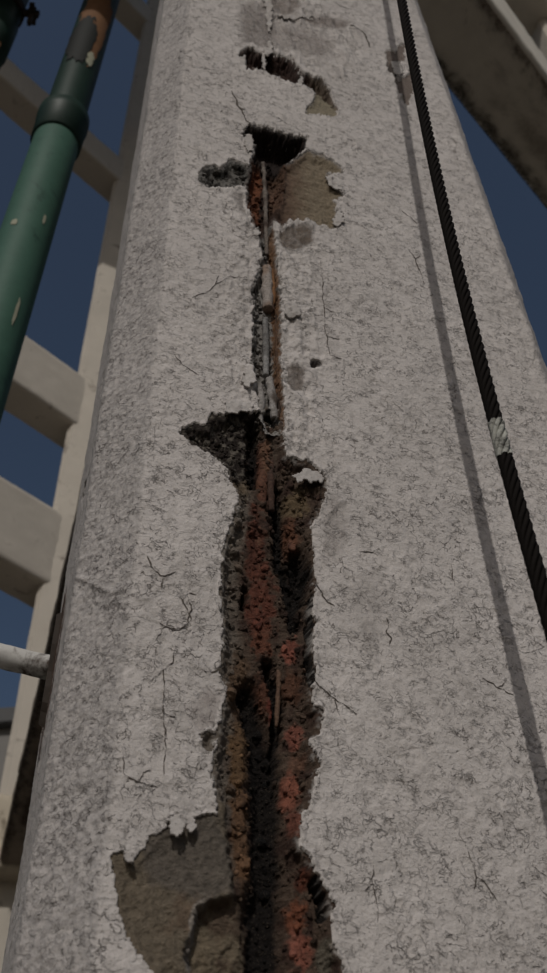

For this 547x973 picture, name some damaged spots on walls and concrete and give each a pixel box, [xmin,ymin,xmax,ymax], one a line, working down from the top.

peeling [239,0,345,117]
peeling [385,44,414,106]
water stain [437,58,547,209]
spalling [110,125,345,973]